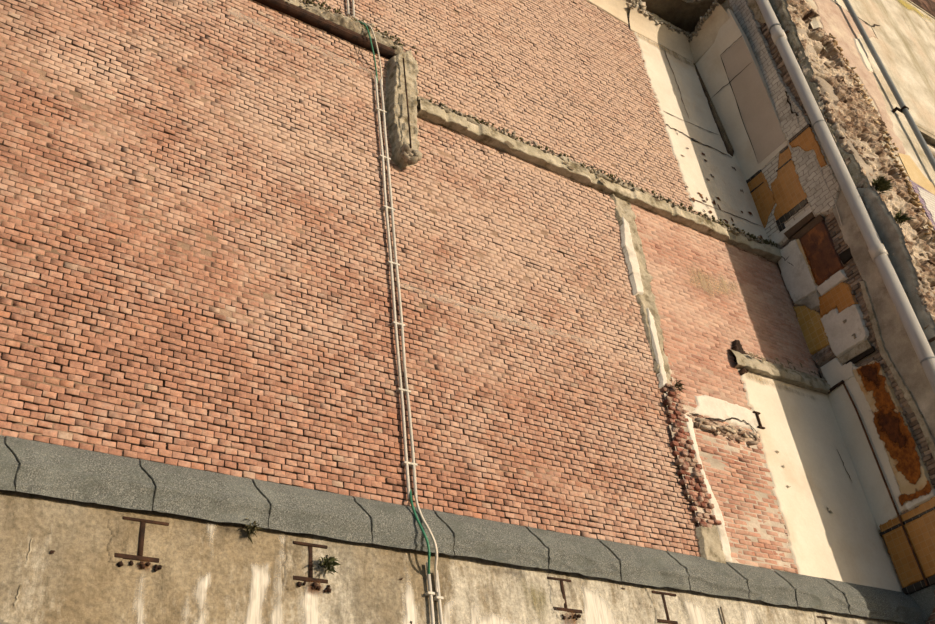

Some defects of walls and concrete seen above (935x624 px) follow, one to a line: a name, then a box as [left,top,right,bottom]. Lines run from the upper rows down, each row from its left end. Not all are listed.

spalling [687,414,761,446]
corrosion [857,361,932,506]
water stain [197,574,210,624]
water stain [246,565,282,624]
water stain [303,588,320,624]
water stain [404,586,417,624]
water stain [444,603,452,624]
water stain [471,609,514,624]
water stain [583,588,617,624]
water stain [685,601,709,624]